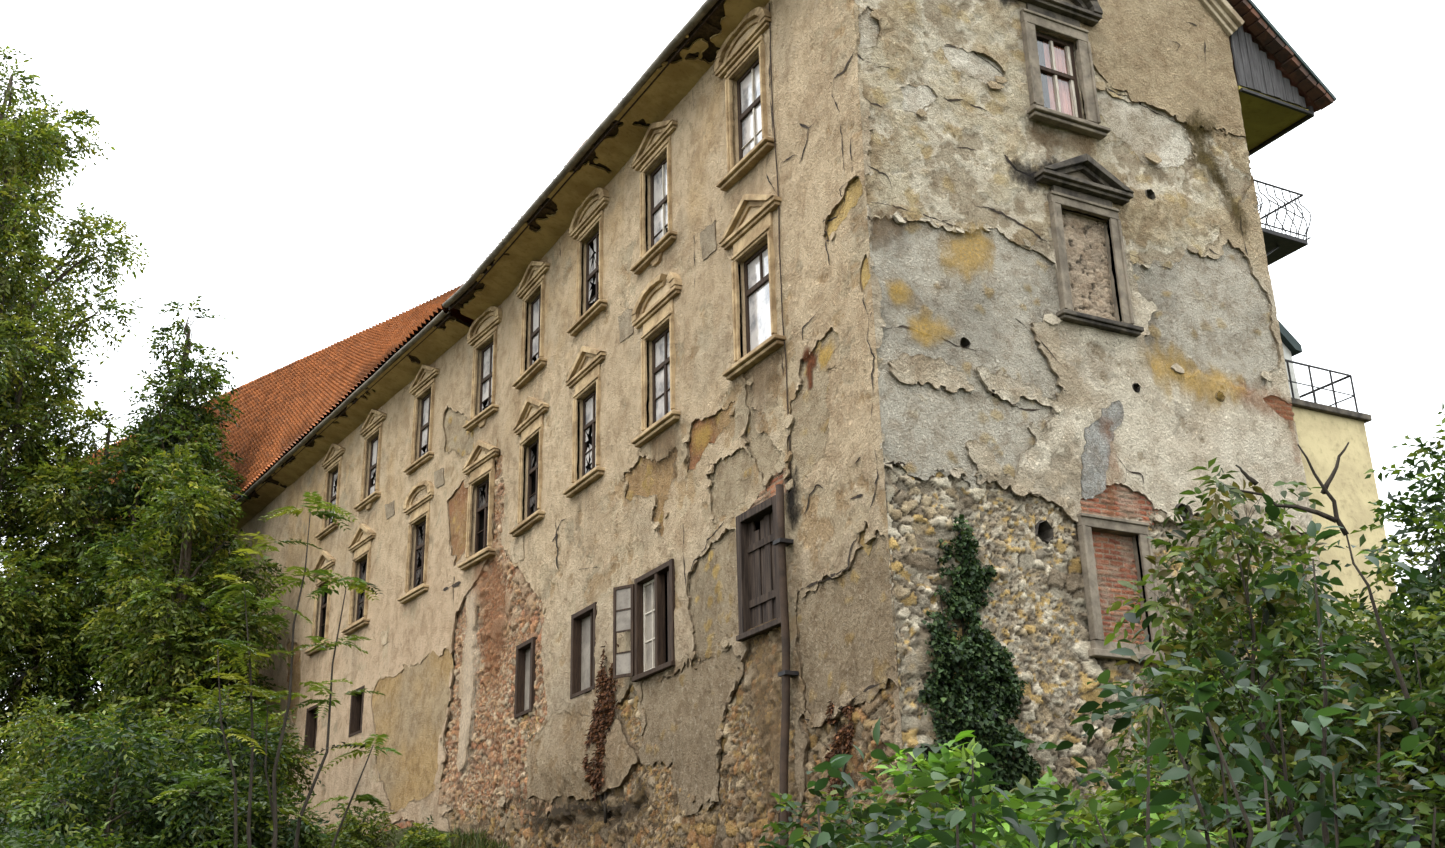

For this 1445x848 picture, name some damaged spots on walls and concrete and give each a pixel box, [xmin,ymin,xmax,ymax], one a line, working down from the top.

crack [1107,88,1175,122]
crack [766,44,1047,266]
flaking render [826,0,1294,489]
crack [1132,218,1248,270]
crack [781,301,825,371]
crack [798,289,1047,591]
flaking render [1080,484,1159,526]
crack [683,522,724,584]
flaking render [372,451,577,833]
crack [805,682,884,721]